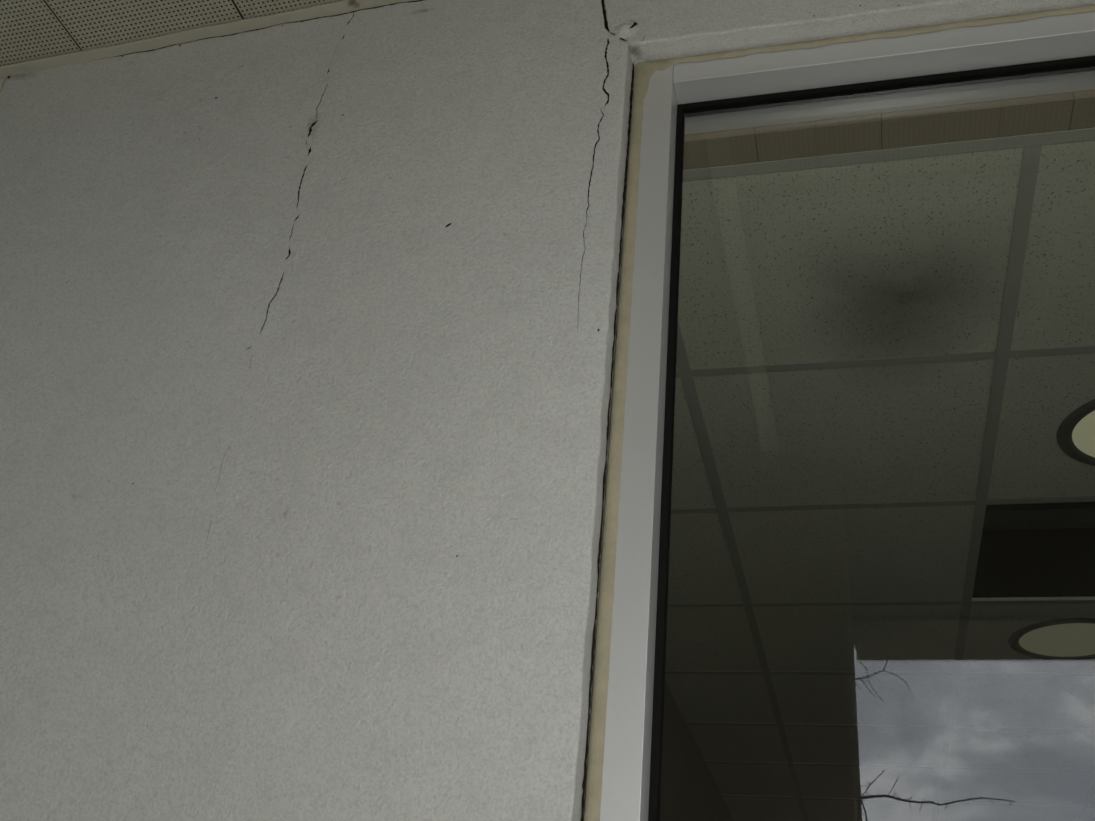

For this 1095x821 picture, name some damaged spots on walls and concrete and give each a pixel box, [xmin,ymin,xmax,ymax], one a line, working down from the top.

crack [102,0,424,363]
crack [577,0,634,821]